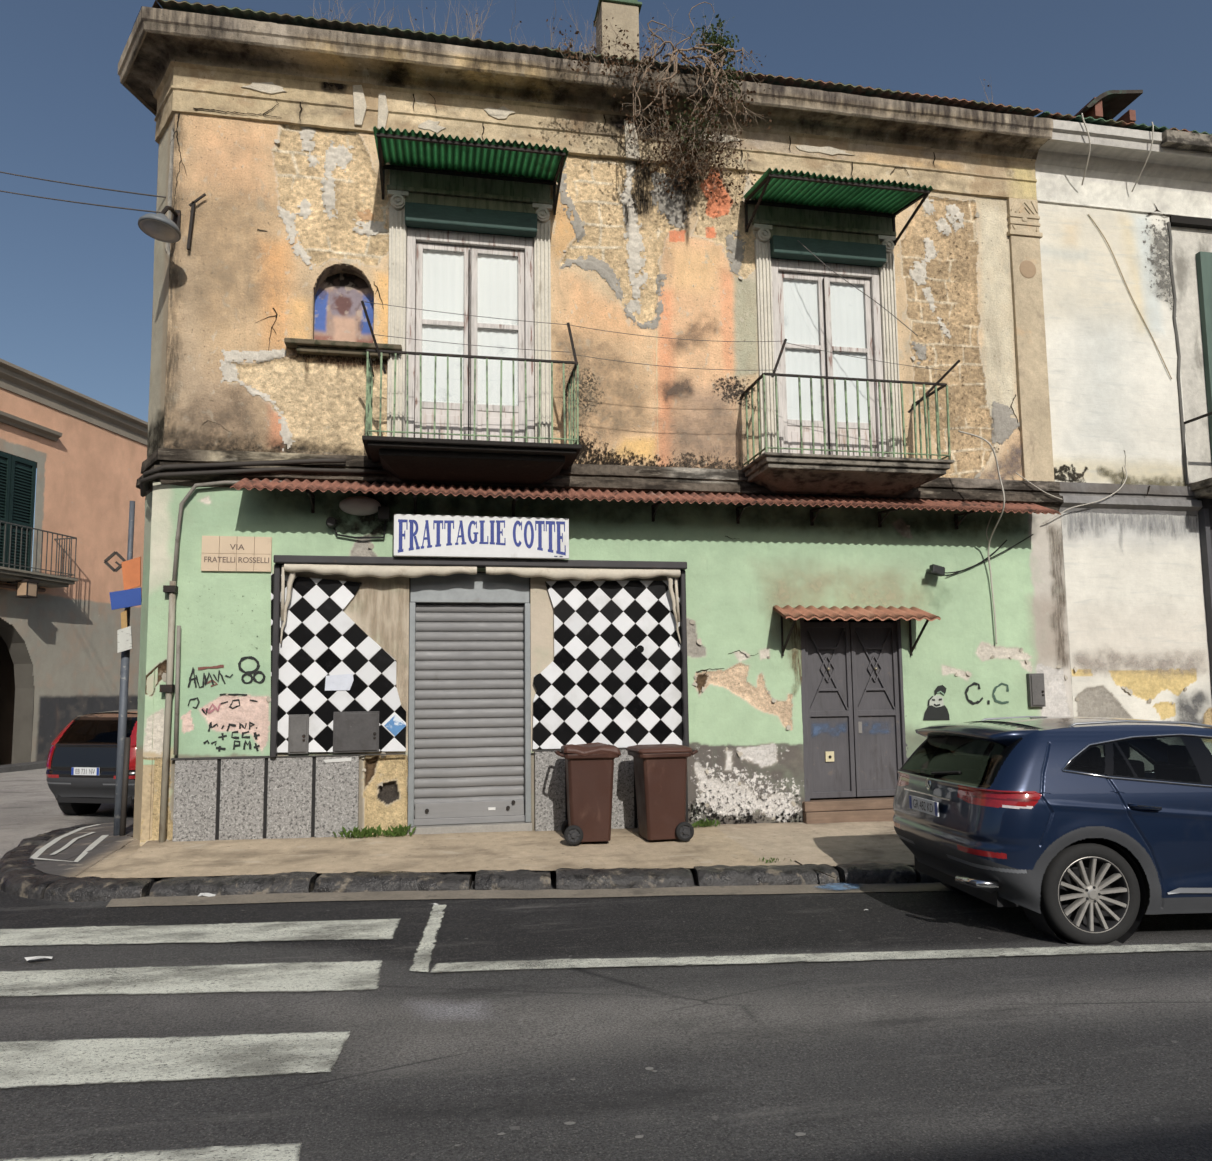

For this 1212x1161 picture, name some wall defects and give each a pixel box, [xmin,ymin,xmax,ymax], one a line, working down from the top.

flaking render [272,124,390,266]
flaking render [561,154,756,324]
water stain [1142,218,1177,317]
flaking render [901,195,994,479]
flaking render [231,354,388,455]
water stain [558,342,747,469]
water stain [713,376,757,415]
peeling [687,618,794,730]
peeling [976,641,1197,719]
flaking render [360,751,408,834]
water stain [688,747,803,824]
peeling [695,743,800,822]